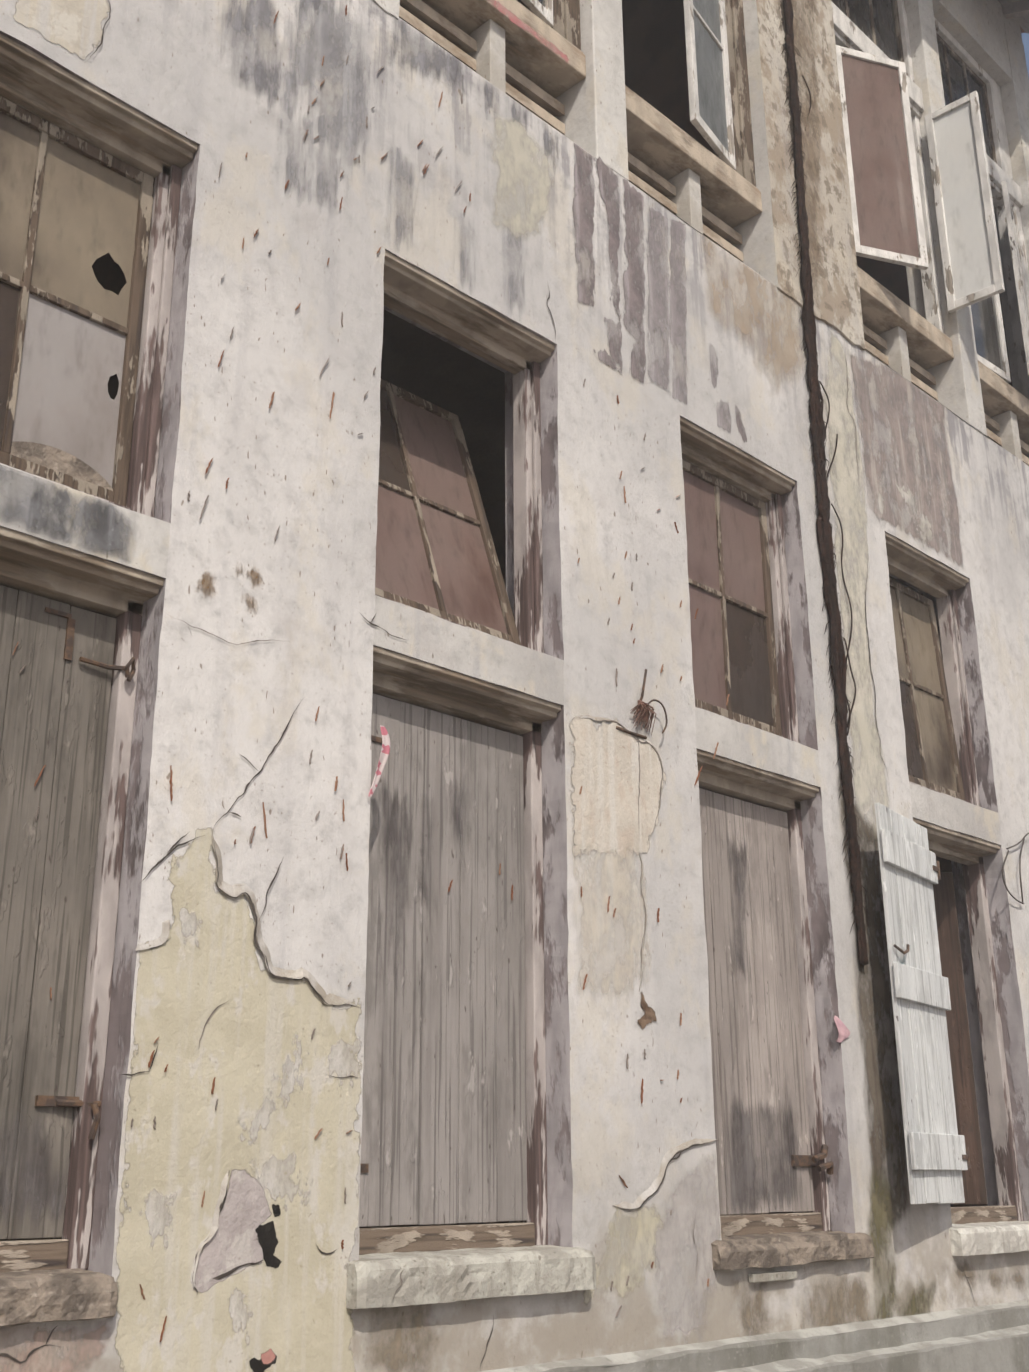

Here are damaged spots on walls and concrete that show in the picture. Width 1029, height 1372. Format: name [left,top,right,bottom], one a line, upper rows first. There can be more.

peeling [13,0,110,60]
leakage [227,0,365,151]
leakage [394,21,463,89]
leakage [544,130,552,156]
leakage [317,172,337,201]
leakage [2,476,130,556]
rust [201,573,215,595]
rust [237,570,260,608]
crack [140,697,362,1008]
peeling [569,700,666,1029]
peeling [115,828,362,1372]
crack [614,1140,719,1210]